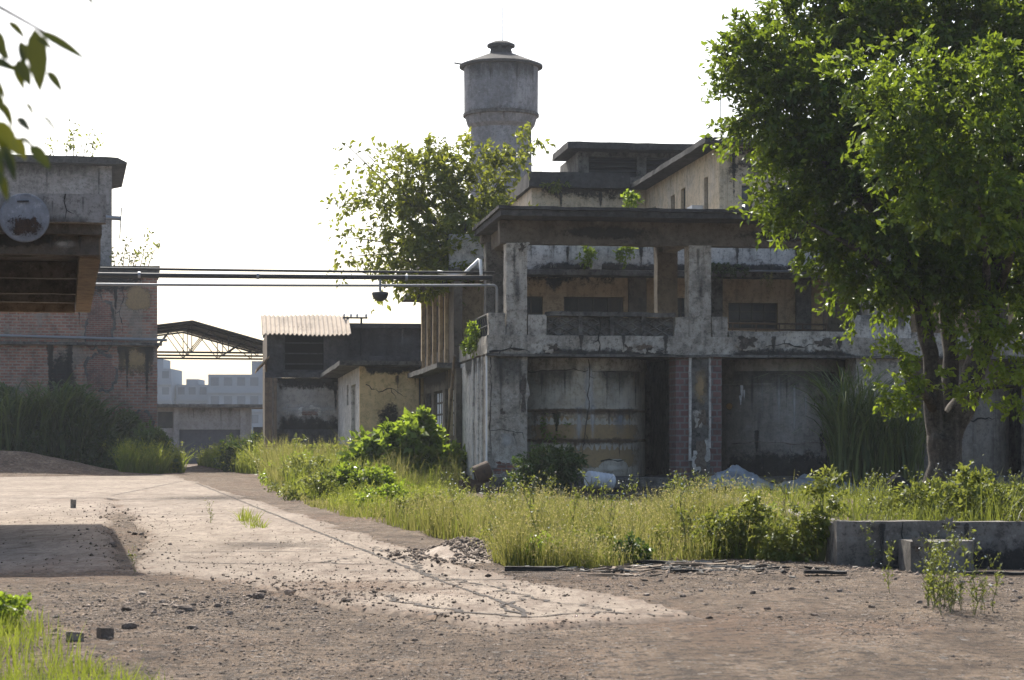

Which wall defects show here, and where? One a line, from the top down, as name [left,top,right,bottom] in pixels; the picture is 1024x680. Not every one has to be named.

spalling [813,337,836,351]
leakage [46,345,76,395]
leakage [117,346,154,394]
crack [489,317,625,453]
leakage [531,367,639,468]